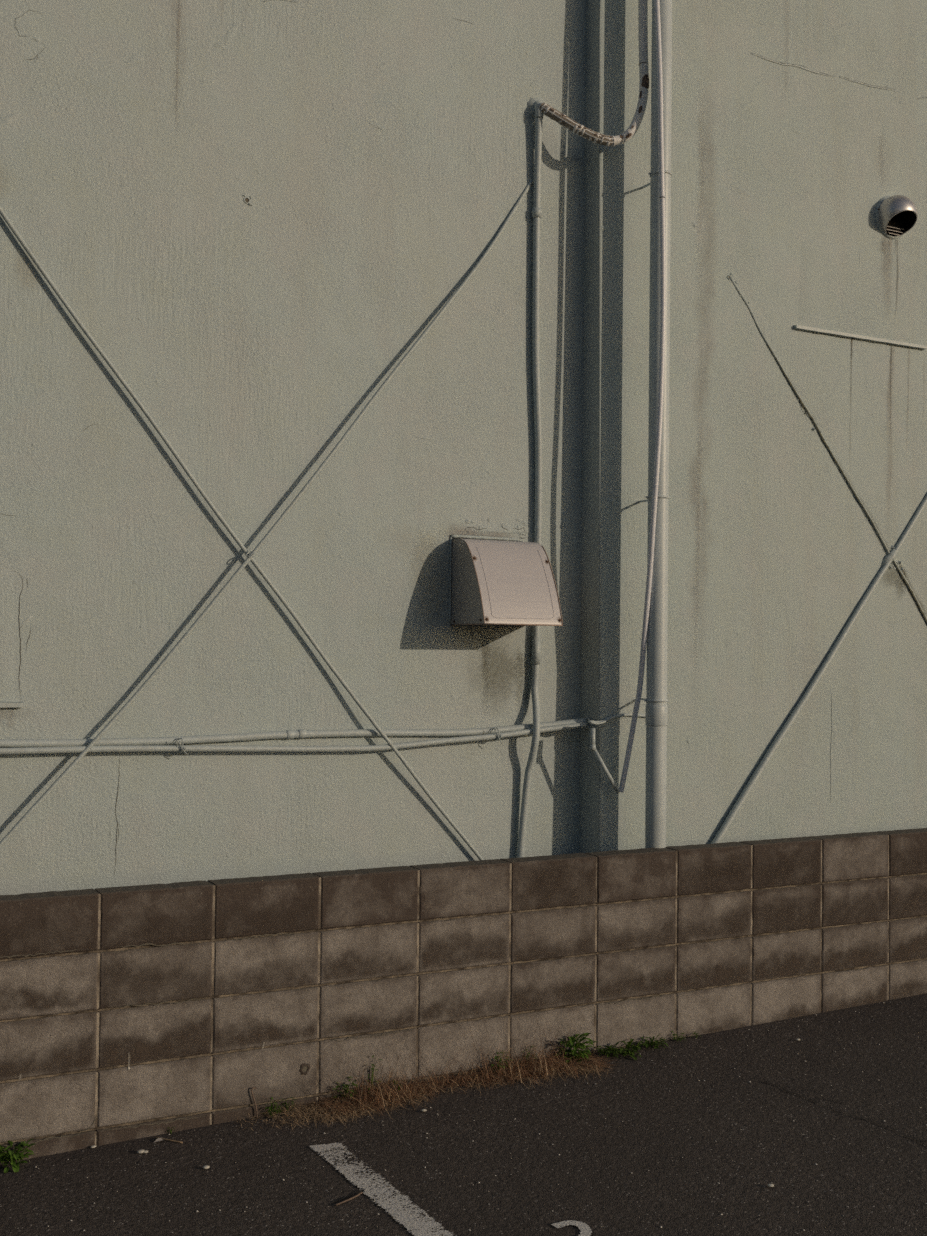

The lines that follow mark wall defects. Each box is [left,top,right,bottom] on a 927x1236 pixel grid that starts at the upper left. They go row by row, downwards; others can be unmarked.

crack [750,52,927,99]
crack [757,326,927,621]